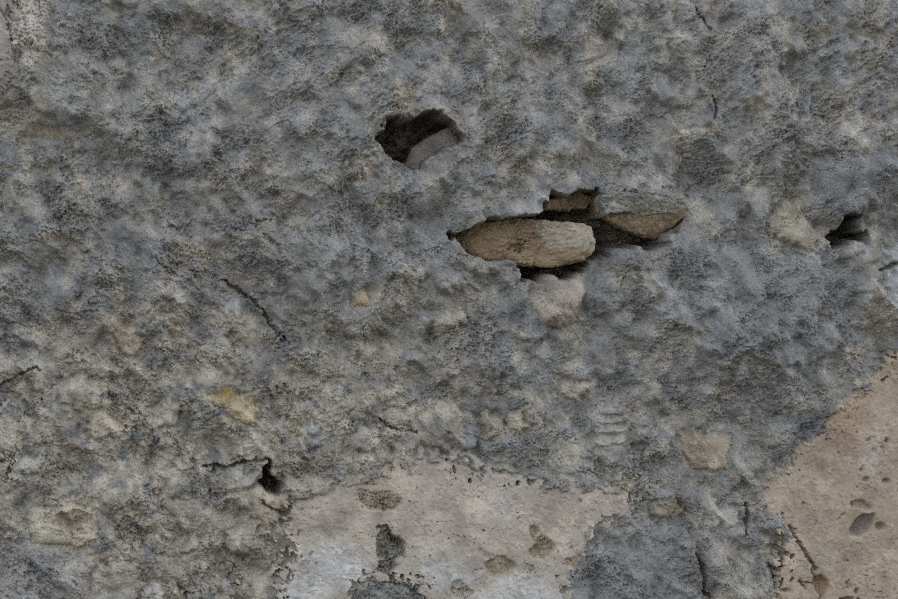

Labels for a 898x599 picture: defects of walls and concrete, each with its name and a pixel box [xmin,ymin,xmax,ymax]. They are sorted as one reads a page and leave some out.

crack [219,279,288,342]
crack [200,456,268,469]